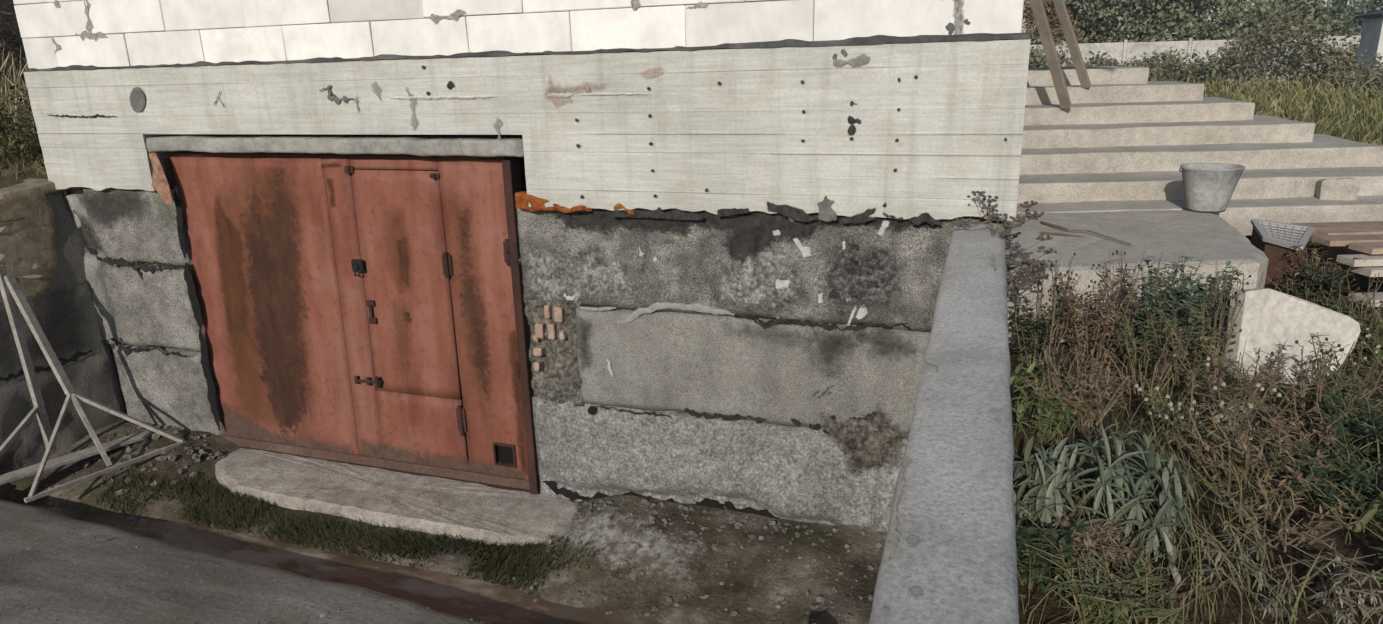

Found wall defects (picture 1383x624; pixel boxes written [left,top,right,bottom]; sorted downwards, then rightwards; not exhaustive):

peeling [0,187,58,298]
crack [0,191,220,431]
rust [215,203,349,458]
rust [392,219,408,285]
rust [457,216,487,386]
spalling [609,207,749,221]
spalling [712,196,943,326]
rust [509,331,526,472]